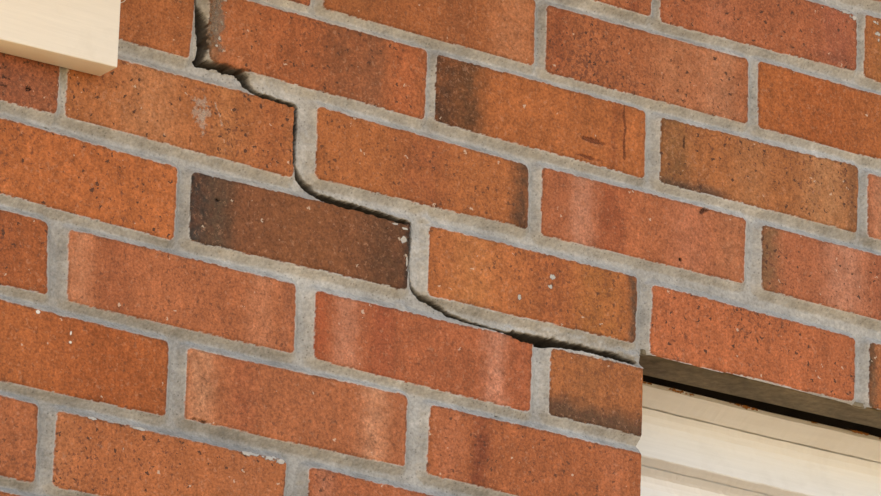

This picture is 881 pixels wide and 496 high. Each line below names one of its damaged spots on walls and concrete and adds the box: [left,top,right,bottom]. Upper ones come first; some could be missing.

crack [190,0,644,370]